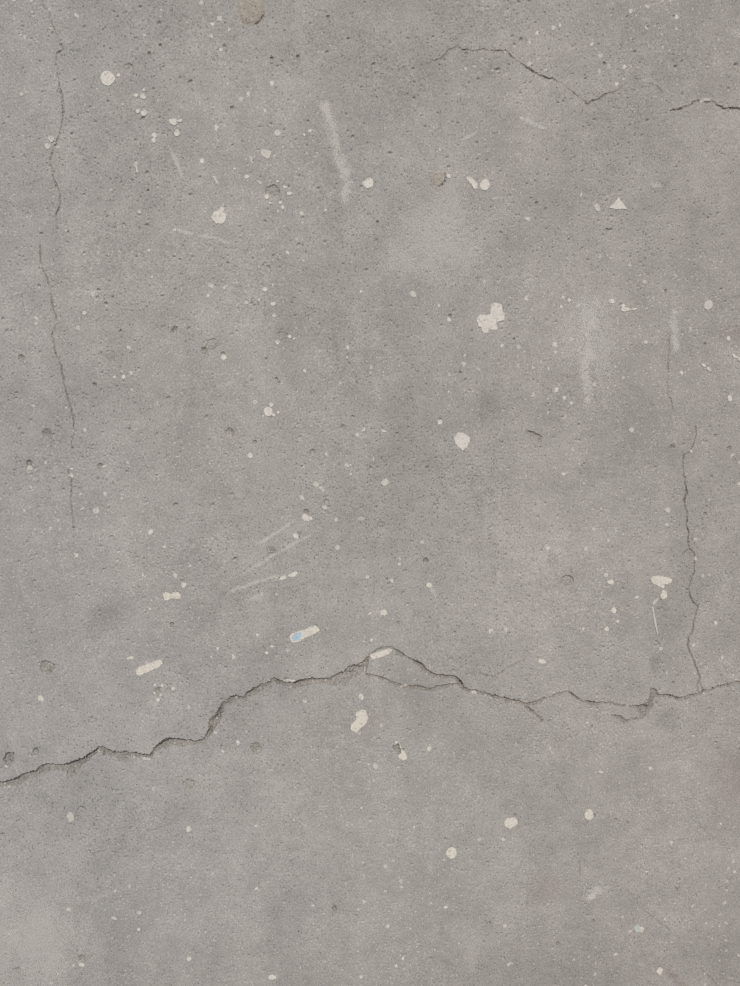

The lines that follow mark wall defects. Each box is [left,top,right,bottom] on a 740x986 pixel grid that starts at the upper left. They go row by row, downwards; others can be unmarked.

crack [375,46,740,111]
crack [39,0,75,544]
crack [0,426,740,789]